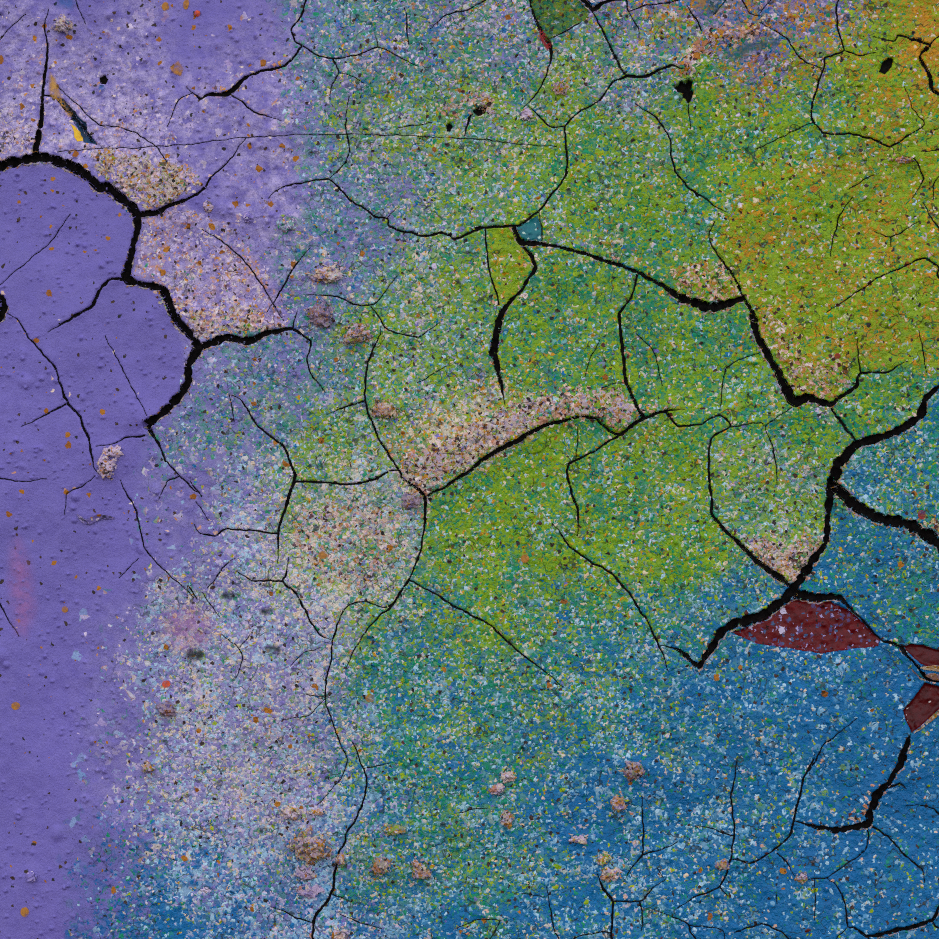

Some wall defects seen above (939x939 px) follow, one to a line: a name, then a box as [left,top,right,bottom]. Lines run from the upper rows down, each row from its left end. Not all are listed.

crack [0,9,325,499]
crack [167,0,939,805]
crack [119,480,233,617]
peeling [733,600,939,734]
crack [271,742,389,939]
crack [457,919,500,939]
crack [521,718,939,939]